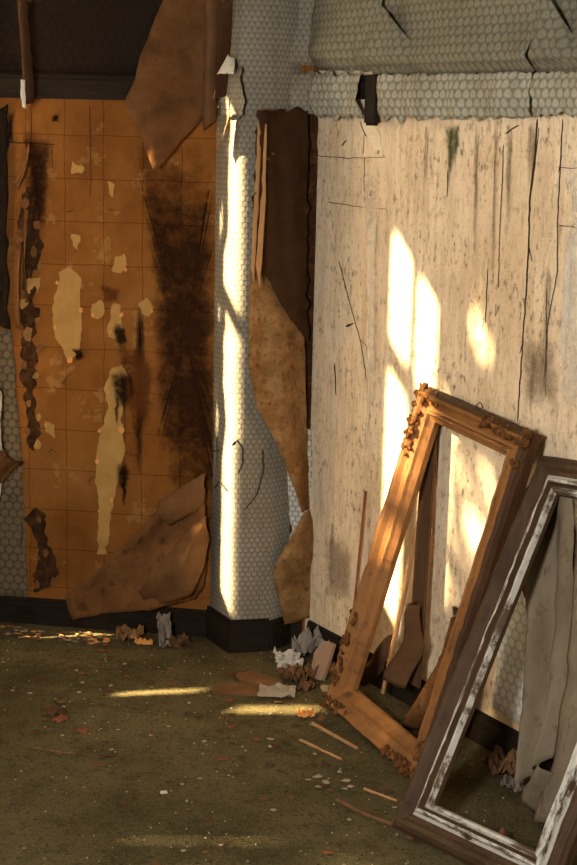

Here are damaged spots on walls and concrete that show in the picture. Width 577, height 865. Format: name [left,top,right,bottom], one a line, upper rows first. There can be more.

peeling [52,267,123,364]
peeling [112,254,127,273]
peeling [138,298,154,317]
leakage [148,176,213,490]
spalling [304,114,318,429]
crack [485,118,576,422]
peeling [95,365,129,554]